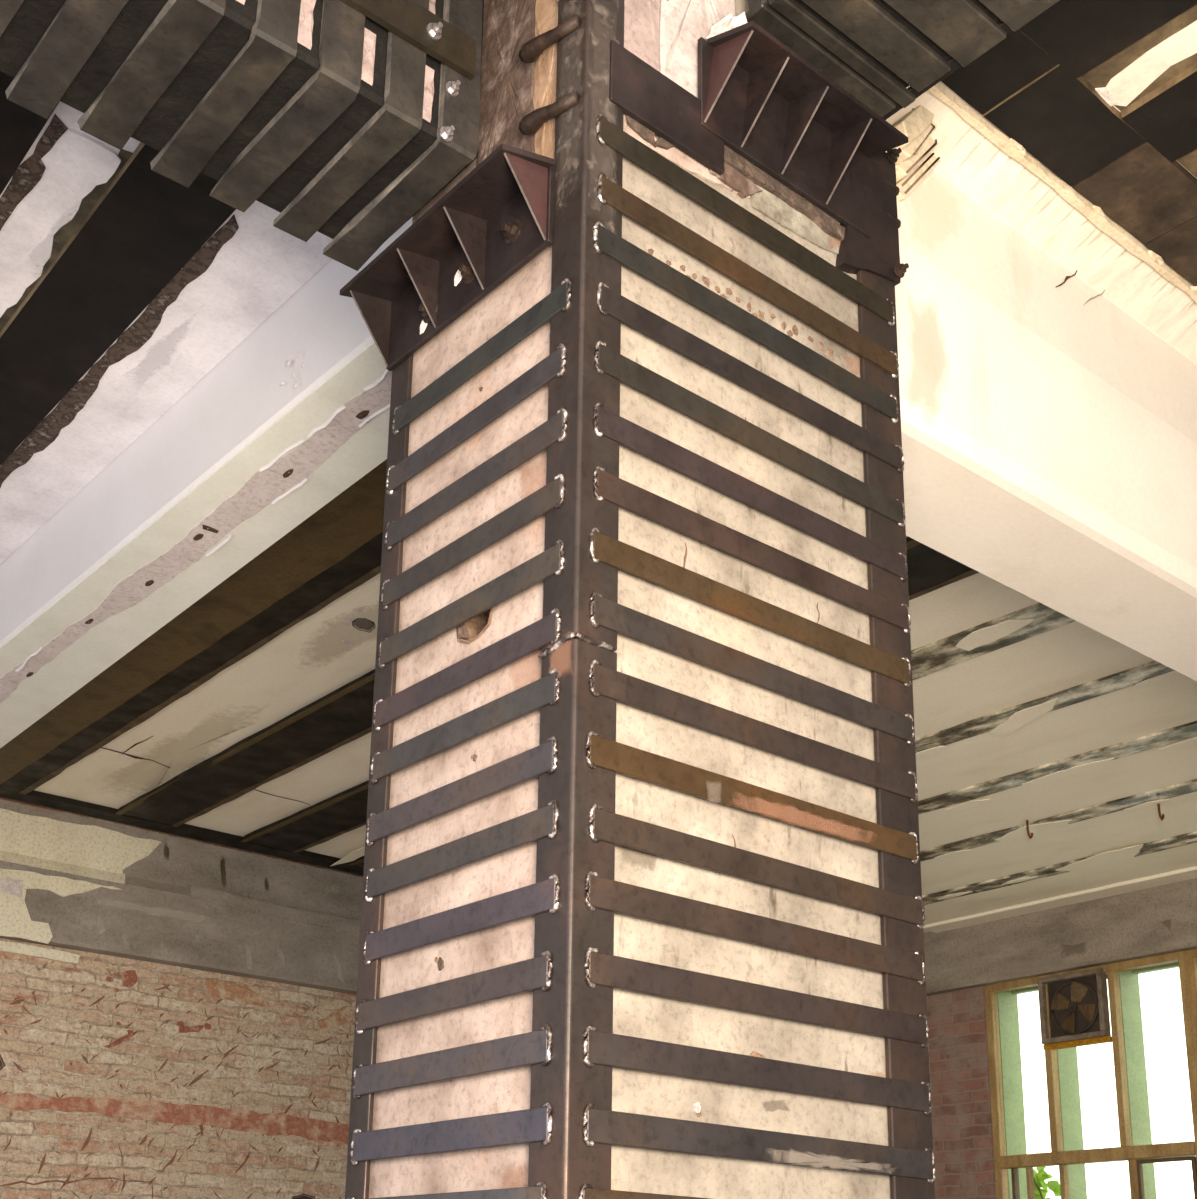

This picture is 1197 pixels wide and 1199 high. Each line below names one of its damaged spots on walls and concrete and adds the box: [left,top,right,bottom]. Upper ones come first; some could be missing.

peeling [0,215,239,488]
peeling [0,369,392,704]
peeling [956,619,1034,651]
peeling [991,698,1057,737]
peeling [143,759,213,812]
rust [708,784,720,800]
peeling [1022,758,1114,792]
peeling [331,846,365,866]
rust [624,847,654,865]
peeling [0,808,161,964]
peeling [923,866,1197,933]
crack [0,1177,157,1199]